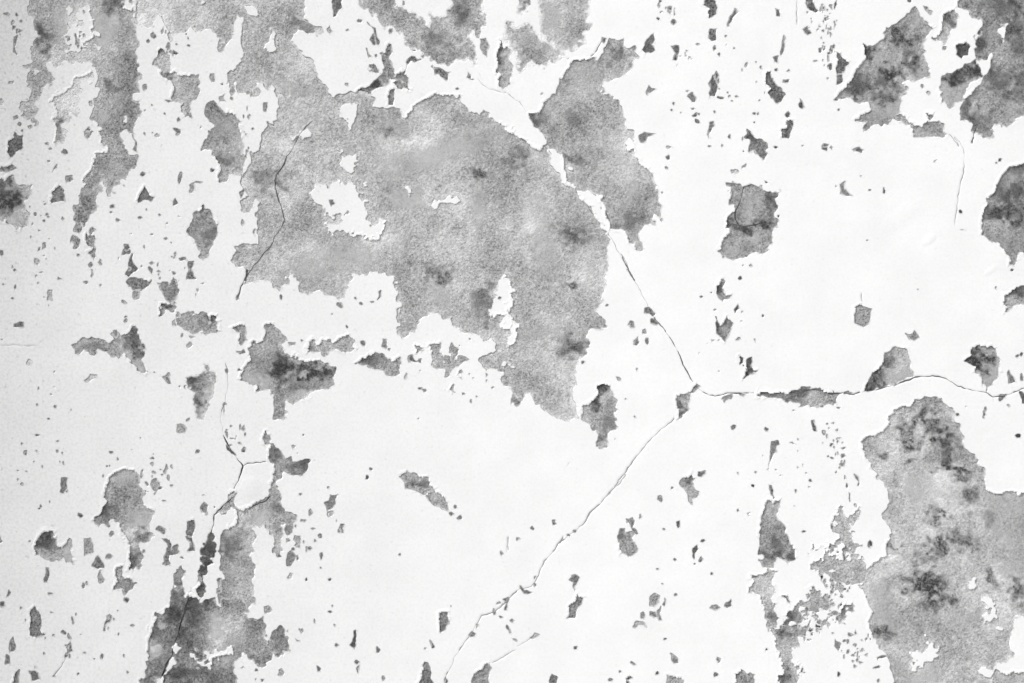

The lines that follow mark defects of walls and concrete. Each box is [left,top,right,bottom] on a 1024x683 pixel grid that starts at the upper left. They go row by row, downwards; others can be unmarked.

peeling [814,0,1024,138]
crack [238,121,312,297]
peeling [0,0,677,683]
peeling [687,36,804,280]
crack [587,195,1024,397]
peeling [700,276,919,411]
peeling [978,159,1024,271]
crack [210,363,270,536]
crack [161,597,189,677]
crack [444,419,674,681]
peeling [737,397,1024,683]